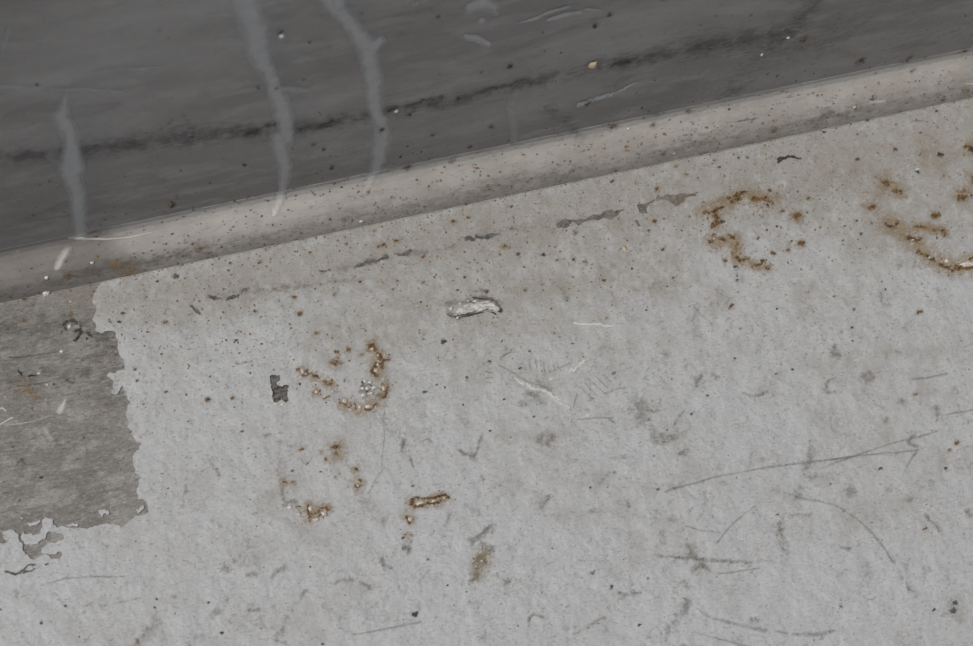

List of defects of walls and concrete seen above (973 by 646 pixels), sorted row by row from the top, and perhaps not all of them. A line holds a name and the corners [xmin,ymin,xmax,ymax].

damp [234,0,339,211]
damp [322,0,438,189]
damp [55,98,97,236]
corrosion [701,187,805,270]
corrosion [857,210,973,278]
corrosion [286,343,393,414]
peeling [0,284,149,575]
corrosion [281,481,332,527]
corrosion [400,490,455,544]